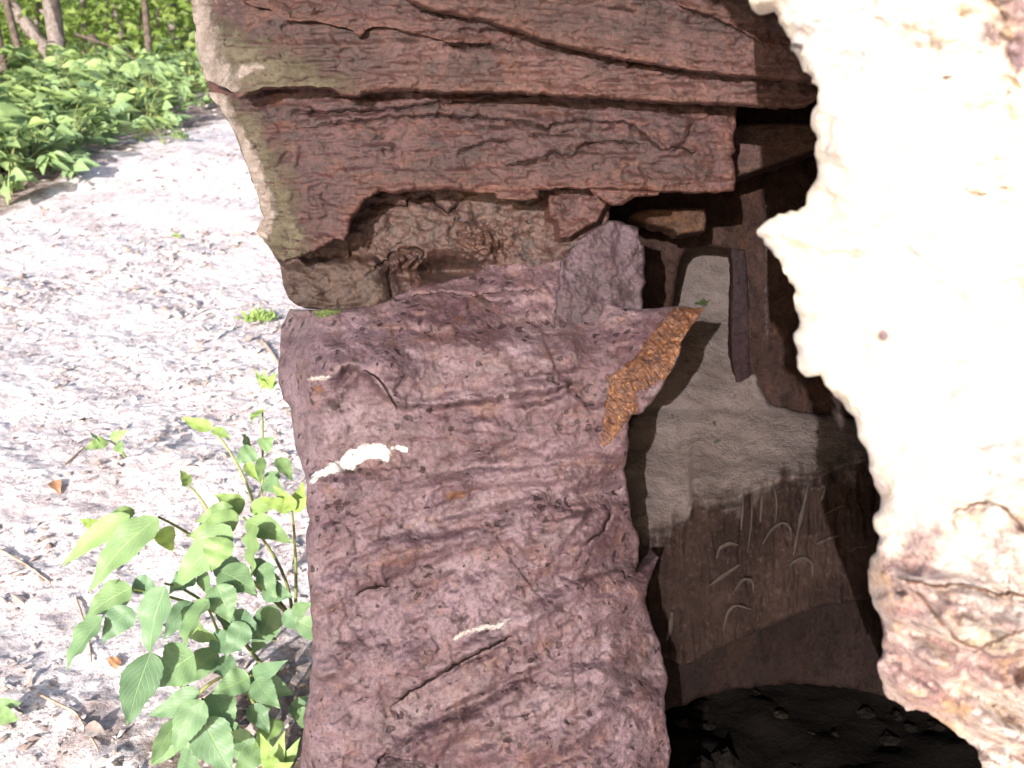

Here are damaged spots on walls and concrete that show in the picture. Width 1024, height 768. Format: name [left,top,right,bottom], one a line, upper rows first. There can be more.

crack [393,636,512,705]